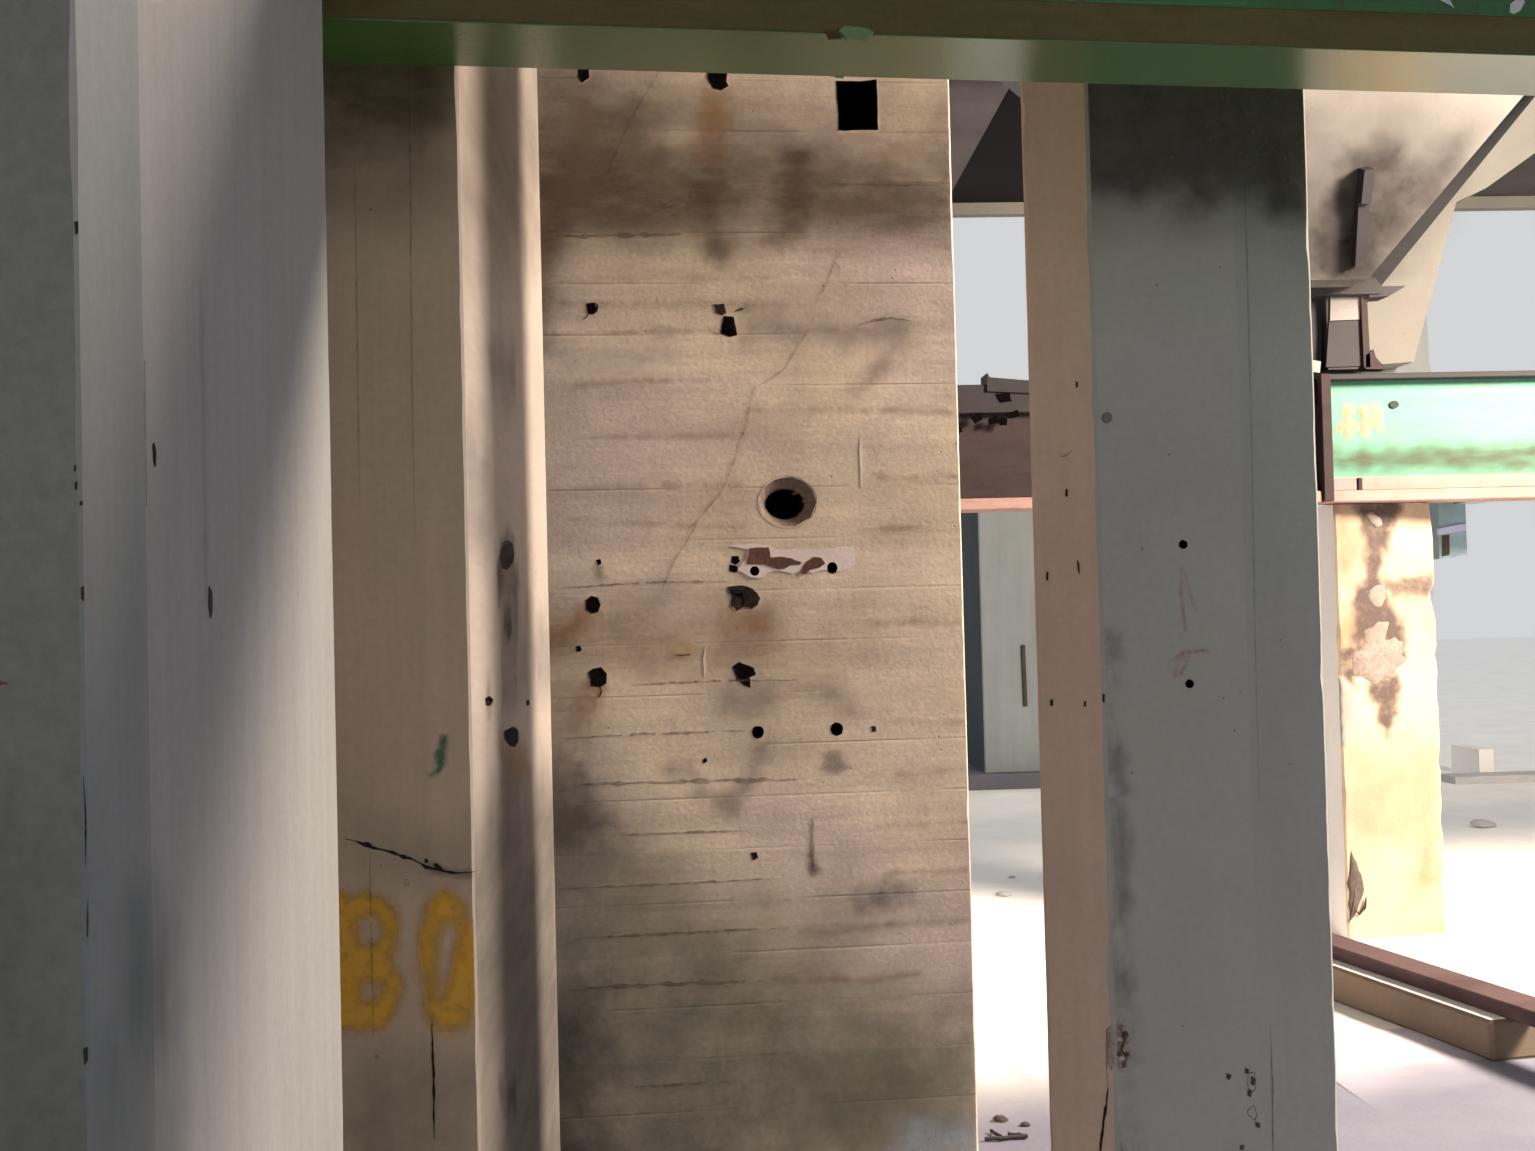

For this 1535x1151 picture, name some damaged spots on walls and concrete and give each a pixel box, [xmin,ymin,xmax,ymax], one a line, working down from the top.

spalling [727,547,825,625]
leakage [1341,503,1431,682]
leakage [1370,676,1400,729]
crack [345,839,476,874]